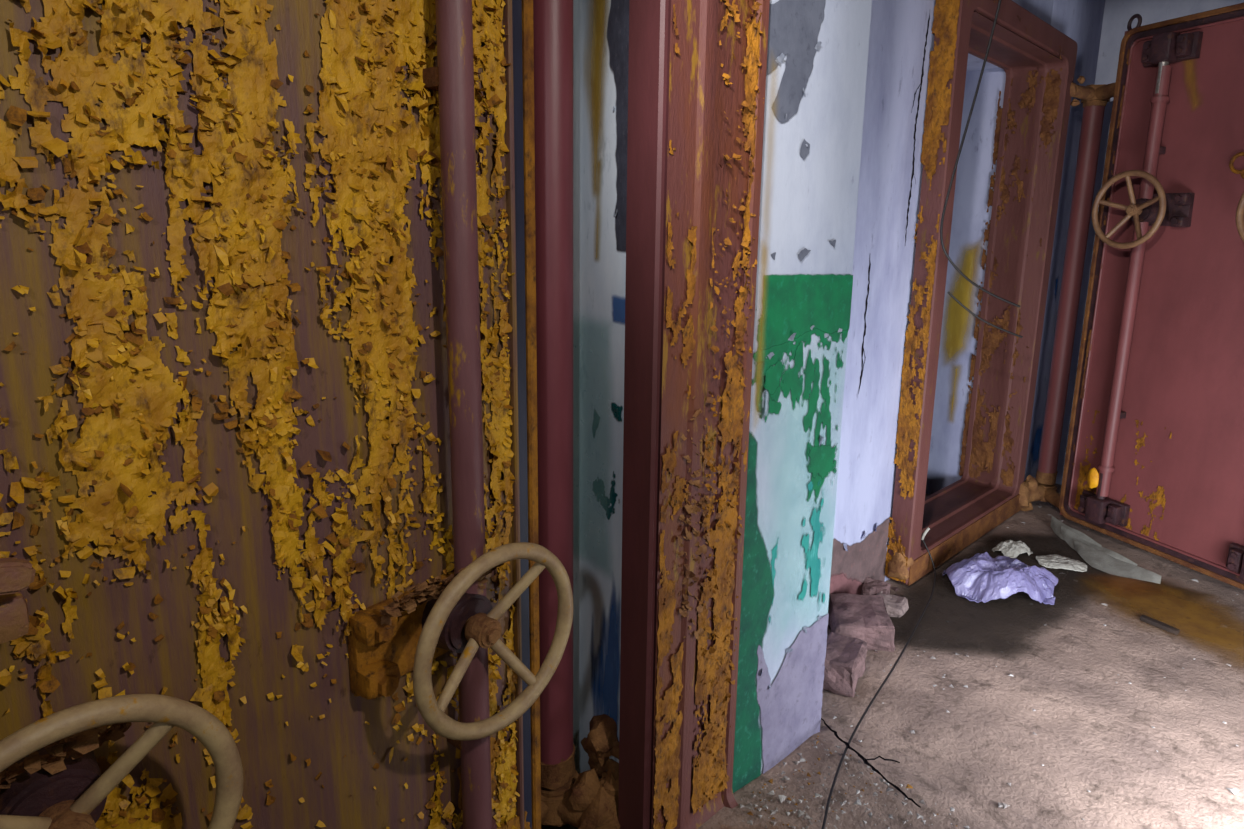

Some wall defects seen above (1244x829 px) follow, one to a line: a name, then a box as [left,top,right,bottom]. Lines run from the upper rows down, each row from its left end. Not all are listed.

peeling [766,0,826,123]
rust [73,242,116,281]
rust [59,307,150,387]
peeling [0,0,454,743]
rust [217,274,268,300]
peeling [472,0,515,552]
rust [675,0,764,812]
rust [945,245,979,419]
rust [263,481,385,638]
peeling [752,248,890,774]
peeling [95,769,179,829]
peeling [491,720,519,828]